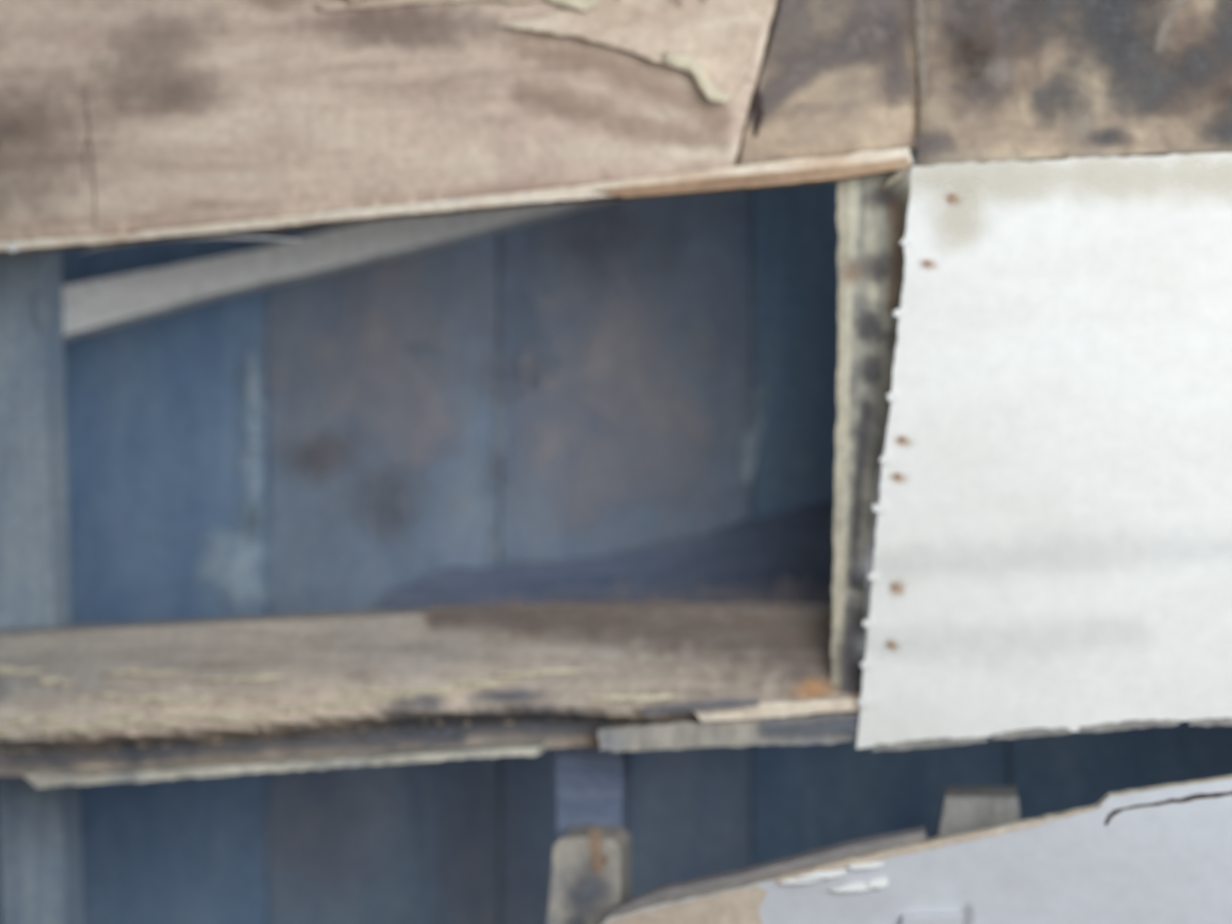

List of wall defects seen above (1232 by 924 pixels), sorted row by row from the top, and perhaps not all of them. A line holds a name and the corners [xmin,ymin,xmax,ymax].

peeling [547,0,599,12]
peeling [664,52,733,103]
water stain [750,0,926,120]
water stain [943,0,1232,145]
water stain [851,401,872,586]
peeling [605,806,1105,924]
crack [1105,791,1232,825]